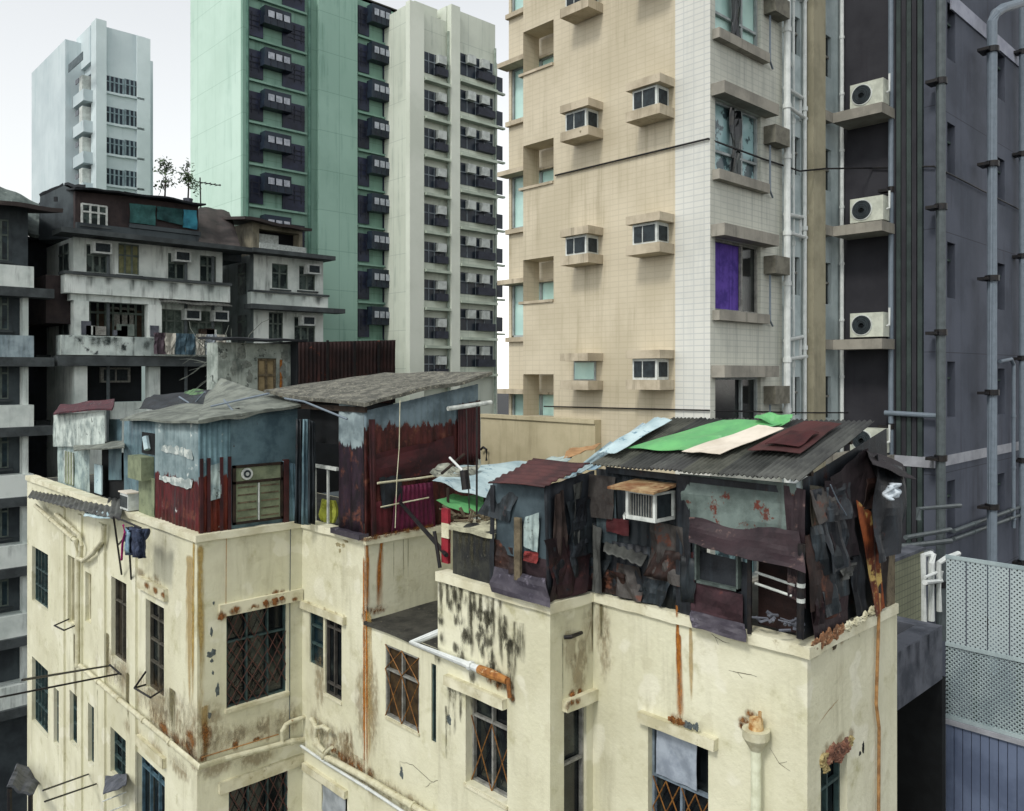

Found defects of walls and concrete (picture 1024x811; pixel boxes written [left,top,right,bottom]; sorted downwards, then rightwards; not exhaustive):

rust [192,543,204,667]
rust [217,590,297,620]
rust [331,524,433,782]
damp [435,583,524,687]